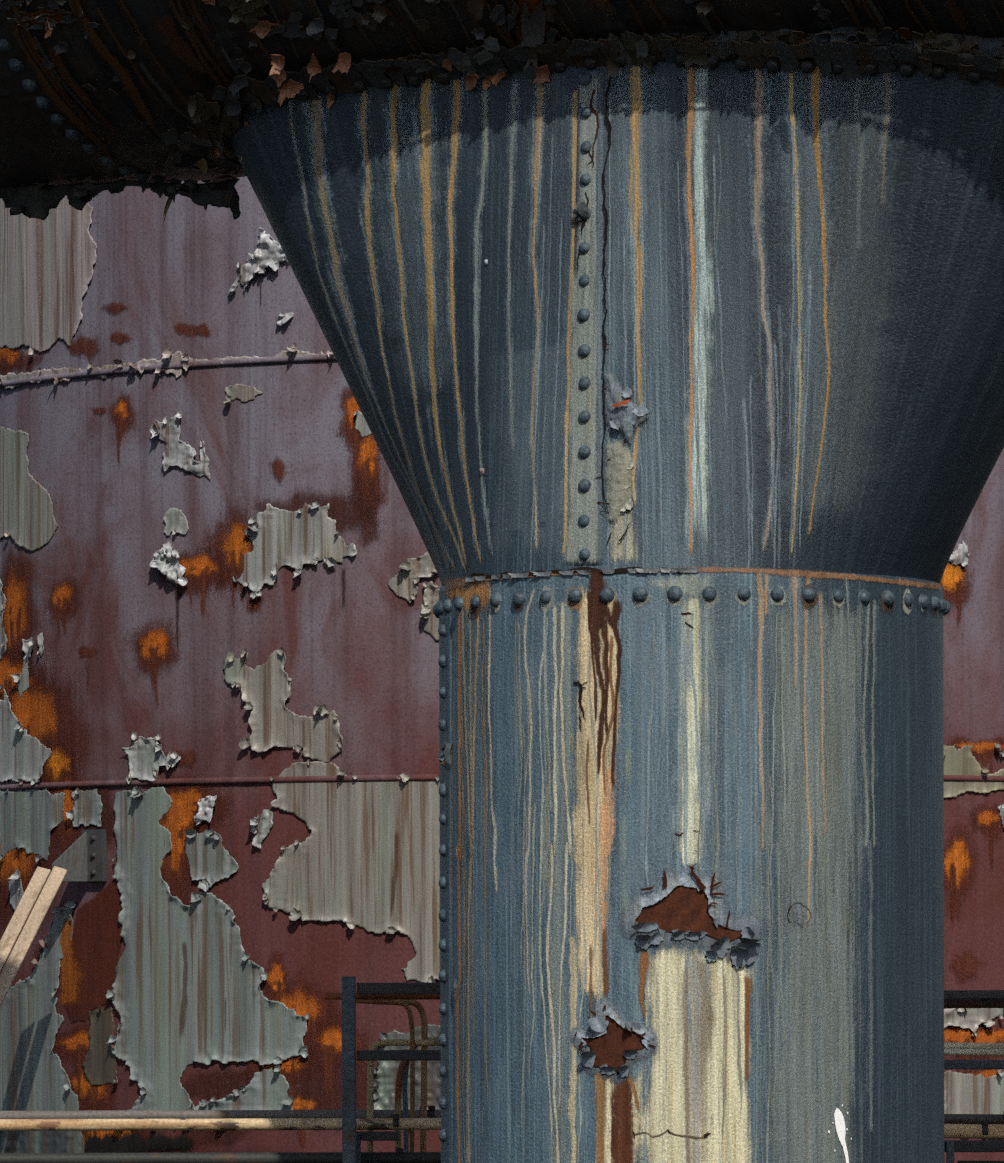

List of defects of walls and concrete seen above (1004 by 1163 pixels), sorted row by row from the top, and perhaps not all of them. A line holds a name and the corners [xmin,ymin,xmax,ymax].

peeling [0,196,97,355]
peeling [228,227,287,296]
crack [465,76,698,583]
peeling [233,501,357,599]
rust [132,66,652,1163]
rust [35,900,55,962]
rust [0,541,114,931]
rust [53,879,122,1111]
peeling [0,633,310,1111]
peeling [223,647,440,982]
peeling [571,996,658,1083]
peeling [621,864,767,970]